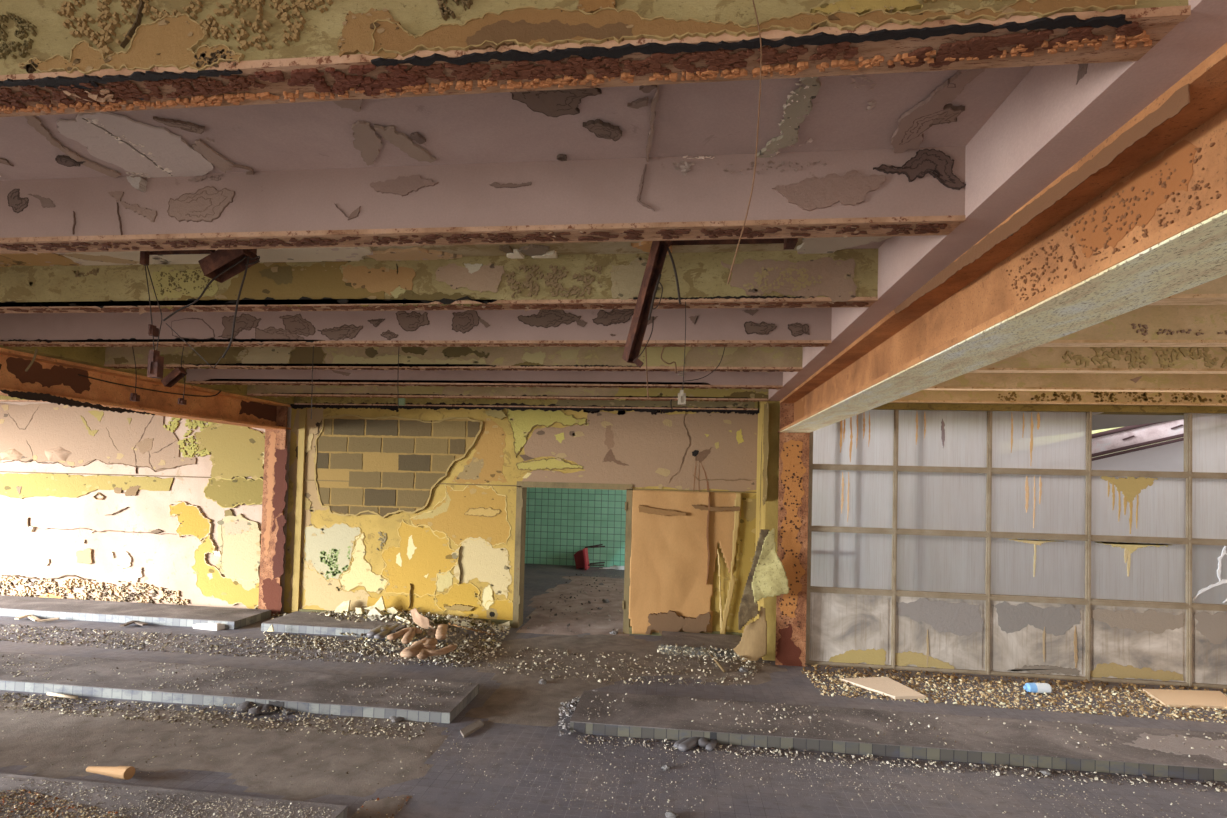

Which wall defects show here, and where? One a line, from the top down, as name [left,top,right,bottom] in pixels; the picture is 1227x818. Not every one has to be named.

flaking render [18,13,245,74]
corrosion [0,14,1152,114]
flaking render [337,0,1138,59]
corrosion [0,296,638,313]
corrosion [0,338,625,415]
flaking render [0,403,265,609]
flaking render [160,344,779,633]
corrosion [166,363,794,614]
crack [1192,546,1227,603]
leakage [896,598,1227,645]
leakage [829,648,954,669]
leakage [1008,663,1184,681]